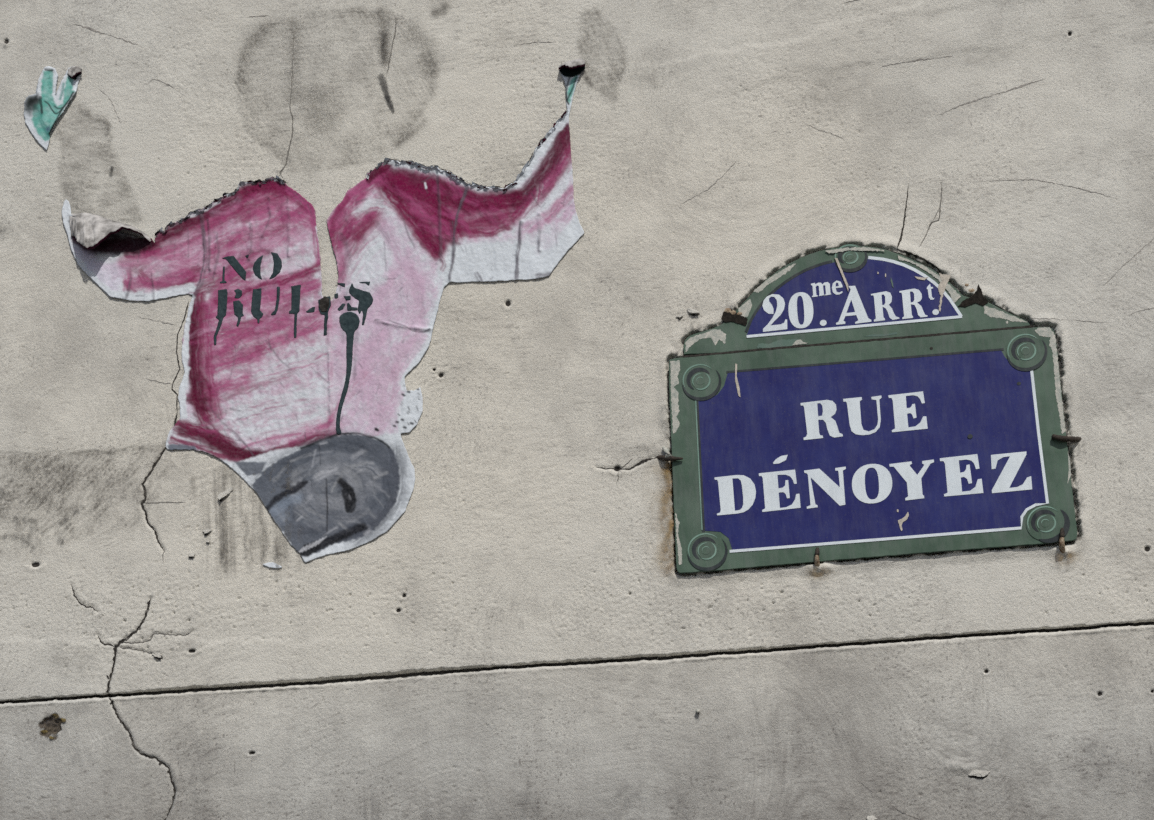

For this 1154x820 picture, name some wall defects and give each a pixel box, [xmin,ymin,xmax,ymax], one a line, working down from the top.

crack [140,301,189,562]
crack [599,456,657,484]
spalling [39,714,66,740]
crack [72,587,193,820]